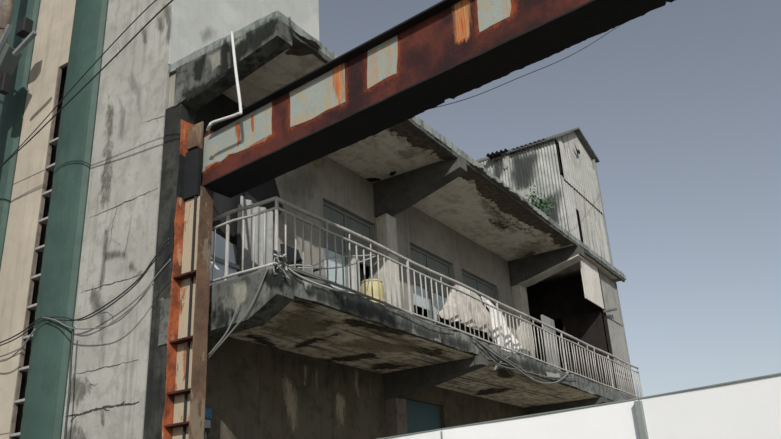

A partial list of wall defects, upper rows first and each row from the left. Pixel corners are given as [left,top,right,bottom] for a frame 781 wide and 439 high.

rust [453,0,517,44]
water stain [182,18,278,101]
rust [287,62,348,132]
rust [365,34,401,92]
water stain [101,106,113,204]
rust [201,101,275,175]
spalling [383,121,452,161]
water stain [494,149,559,223]
water stain [208,303,234,331]
water stain [262,270,469,350]
water stain [497,354,560,379]
crack [65,401,139,422]